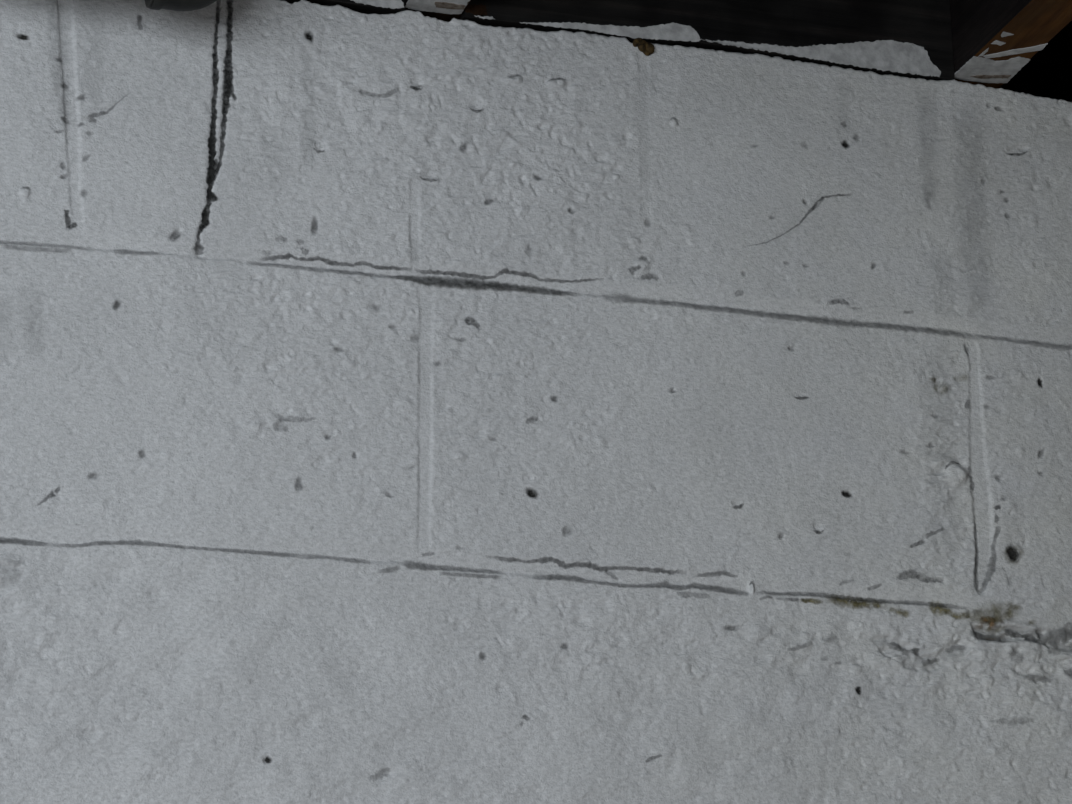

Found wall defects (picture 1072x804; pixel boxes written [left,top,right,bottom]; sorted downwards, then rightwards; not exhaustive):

crack [195,0,236,250]
crack [282,254,562,295]
crack [536,558,615,581]